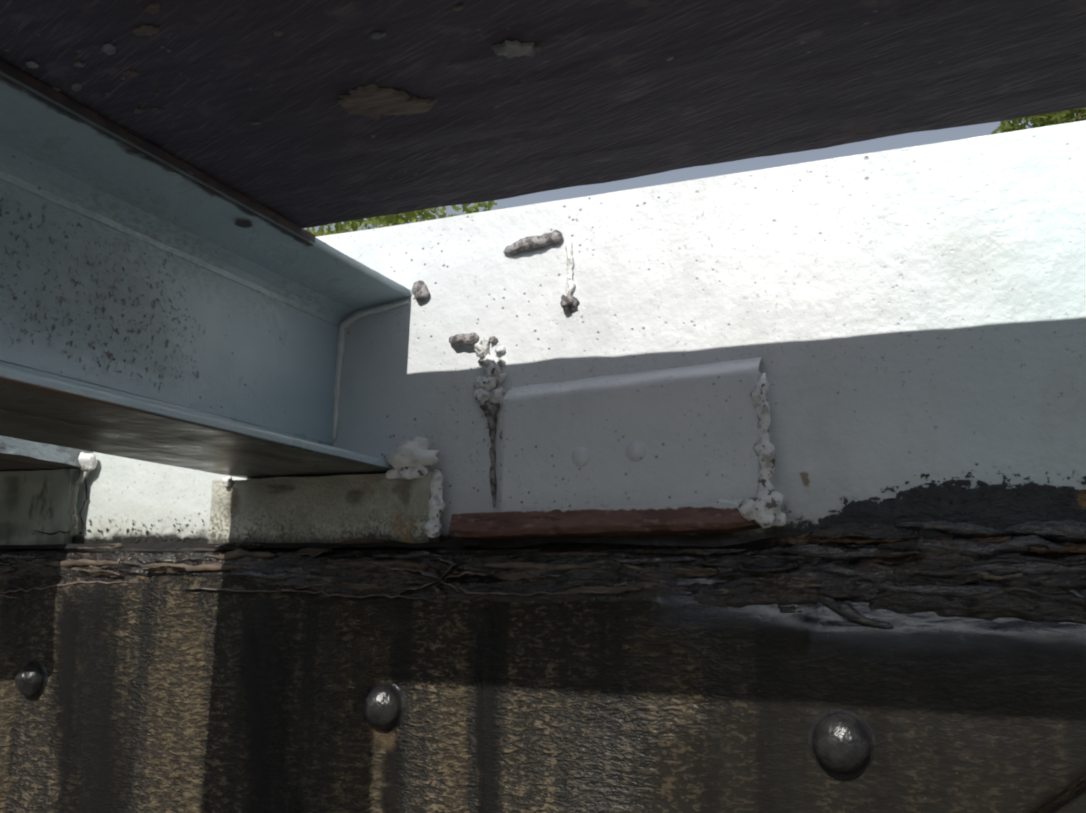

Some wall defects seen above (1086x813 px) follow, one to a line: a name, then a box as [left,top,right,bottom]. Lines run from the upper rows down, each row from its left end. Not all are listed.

peeling [491,40,535,58]
spalling [337,84,439,119]
corrosion [0,59,316,247]
crack [185,558,573,601]
damp [476,608,498,813]
damp [381,742,398,813]